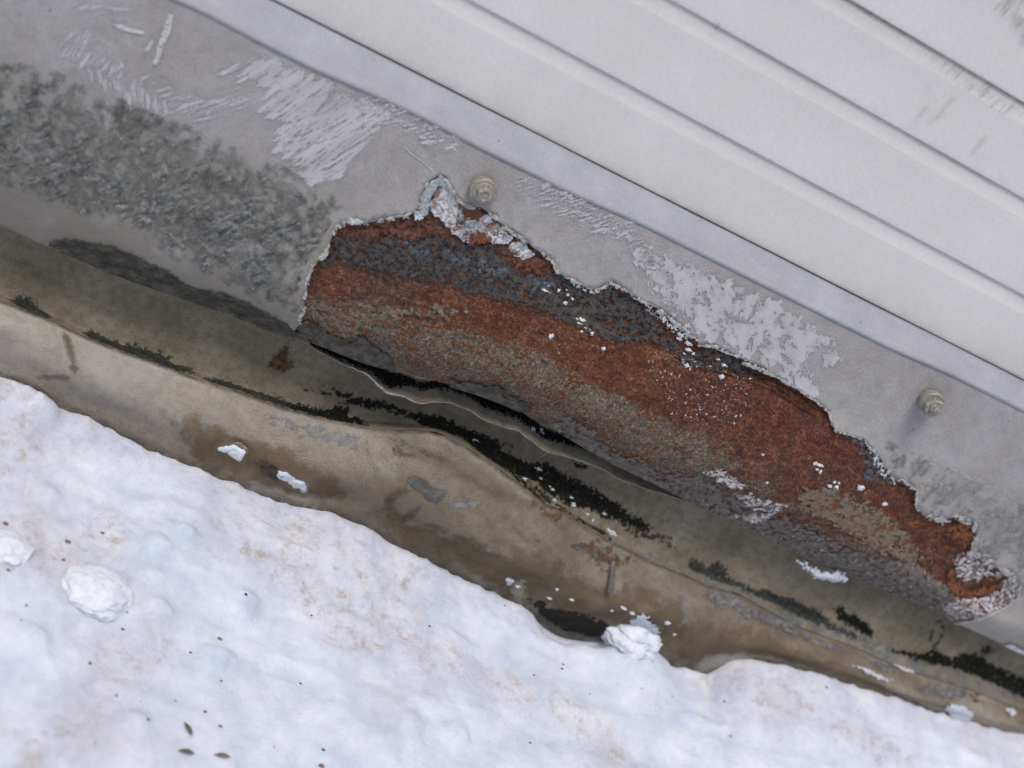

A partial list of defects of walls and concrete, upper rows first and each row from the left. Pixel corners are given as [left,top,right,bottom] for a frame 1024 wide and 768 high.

peeling [420,177,535,260]
damp [44,239,301,340]
damp [83,329,677,549]
corrosion [267,175,1022,625]
peeling [407,476,481,512]
damp [383,489,920,705]
damp [890,644,1024,698]